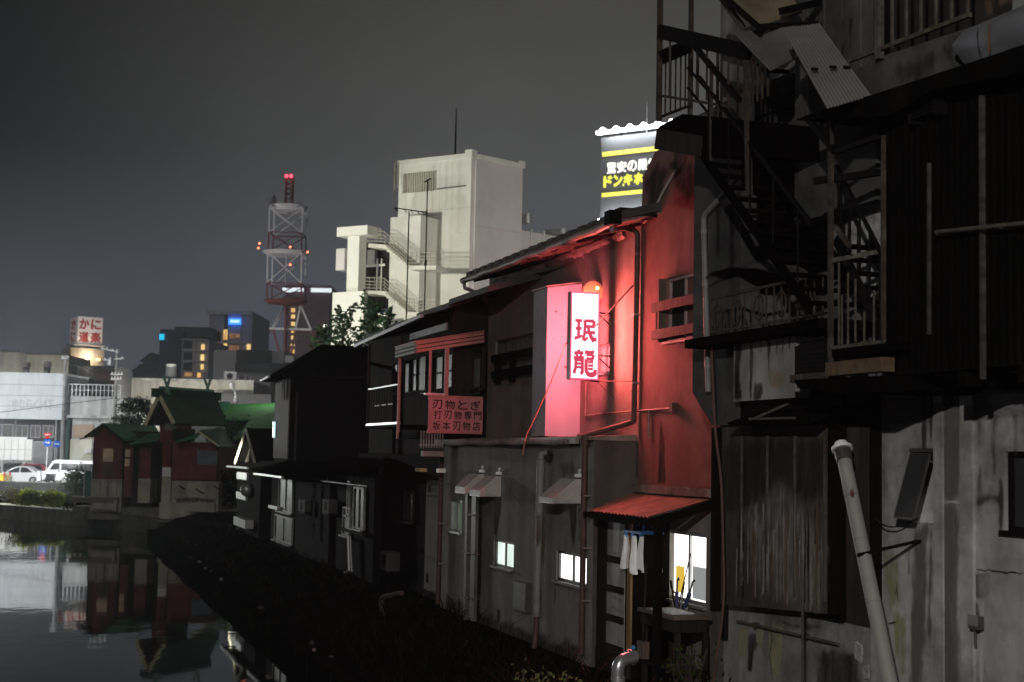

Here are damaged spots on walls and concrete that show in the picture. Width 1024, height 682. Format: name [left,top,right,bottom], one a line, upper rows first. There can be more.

corrosion [722,440,823,611]
damp [895,525,931,682]
damp [922,396,959,682]
damp [976,574,990,617]
damp [977,481,1003,527]